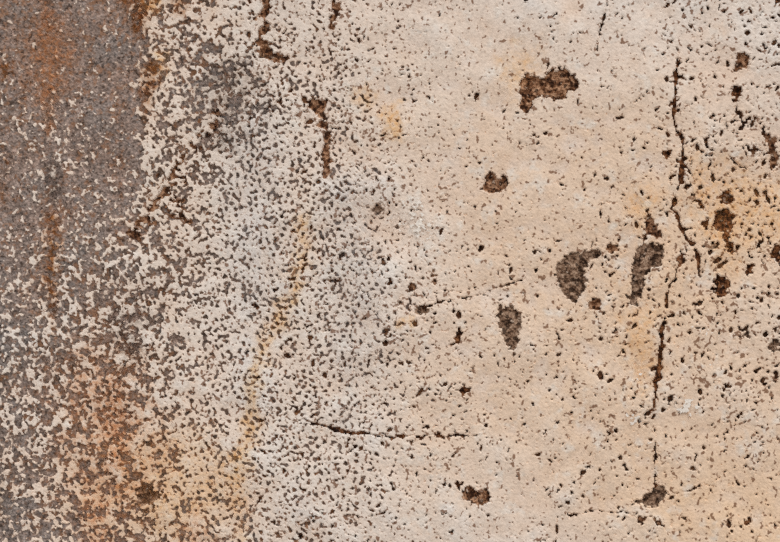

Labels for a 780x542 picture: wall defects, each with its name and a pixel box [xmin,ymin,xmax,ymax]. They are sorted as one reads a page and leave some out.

spalling [502,62,585,120]
spalling [477,162,512,198]
spalling [532,0,780,453]
crack [649,47,720,500]
spalling [484,299,535,387]
crack [288,416,478,441]
spalling [435,478,496,518]
spalling [558,453,601,508]
crack [540,501,638,542]